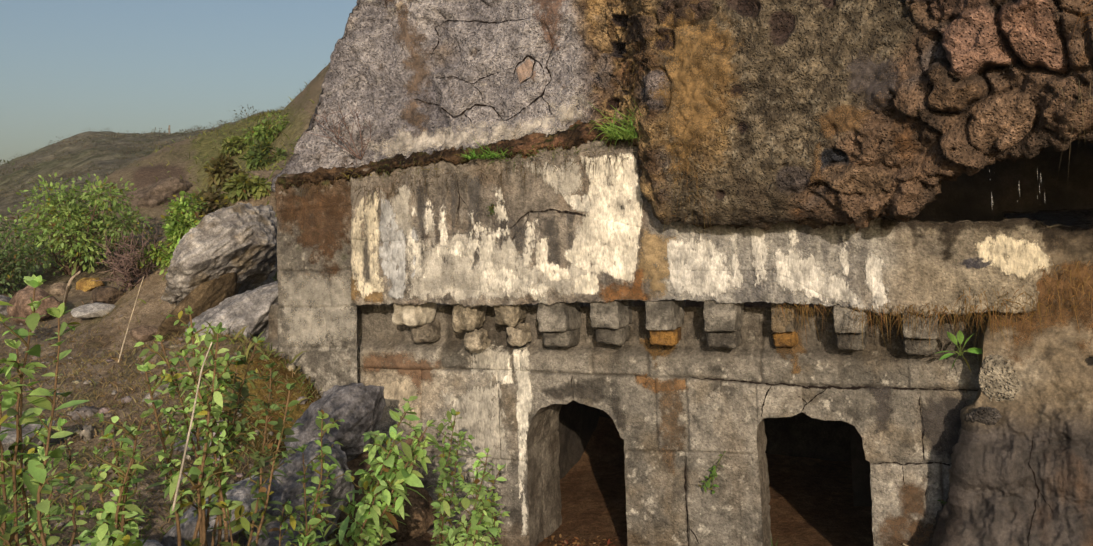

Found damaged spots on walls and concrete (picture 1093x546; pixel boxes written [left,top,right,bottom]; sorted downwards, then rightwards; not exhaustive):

crack [415,18,553,129]
peeling [351,153,643,300]
crack [510,209,588,240]
crack [692,377,977,485]
crack [1027,434,1054,546]